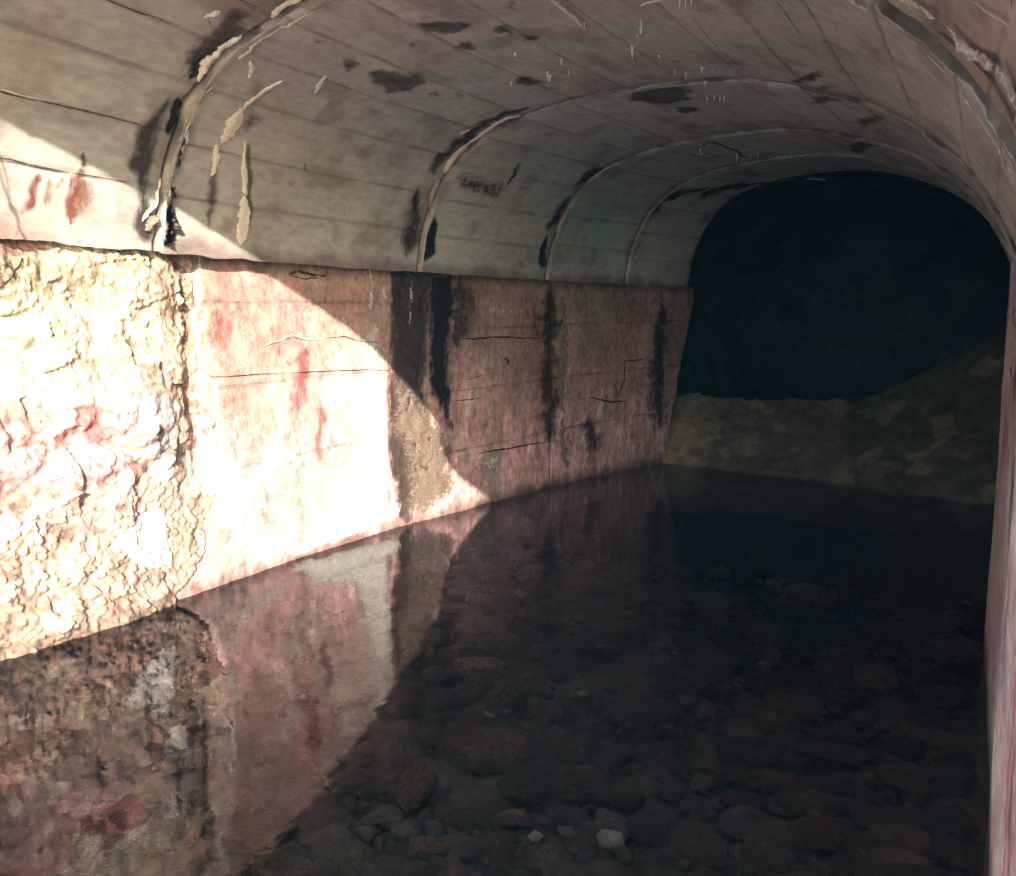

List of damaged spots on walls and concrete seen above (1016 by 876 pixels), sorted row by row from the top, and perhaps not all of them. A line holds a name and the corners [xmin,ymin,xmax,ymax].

crack [550,0,587,31]
crack [641,0,742,69]
water stain [370,71,424,93]
water stain [128,0,339,245]
corrosion [25,174,50,209]
crack [0,158,126,182]
corrosion [66,153,88,223]
spalling [144,186,182,245]
water stain [538,197,570,268]
water stain [291,108,528,555]
water stain [536,287,562,443]
water stain [647,302,669,431]